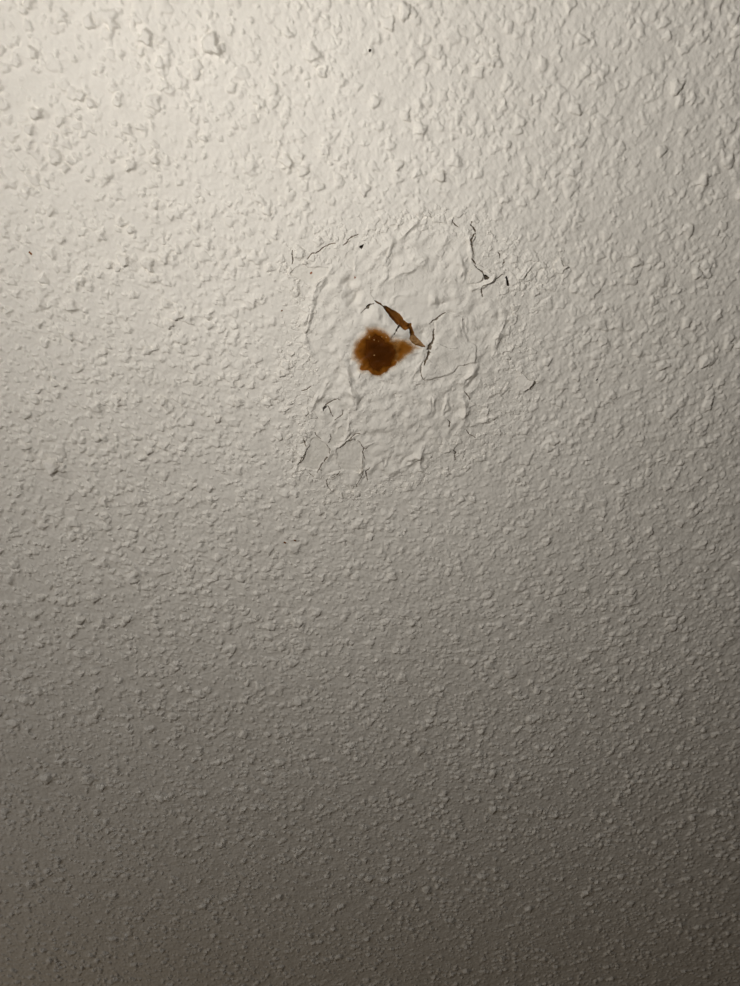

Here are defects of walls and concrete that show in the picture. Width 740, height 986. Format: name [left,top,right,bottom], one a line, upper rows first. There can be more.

crack [291,234,358,264]
crack [452,220,505,297]
crack [361,287,460,379]